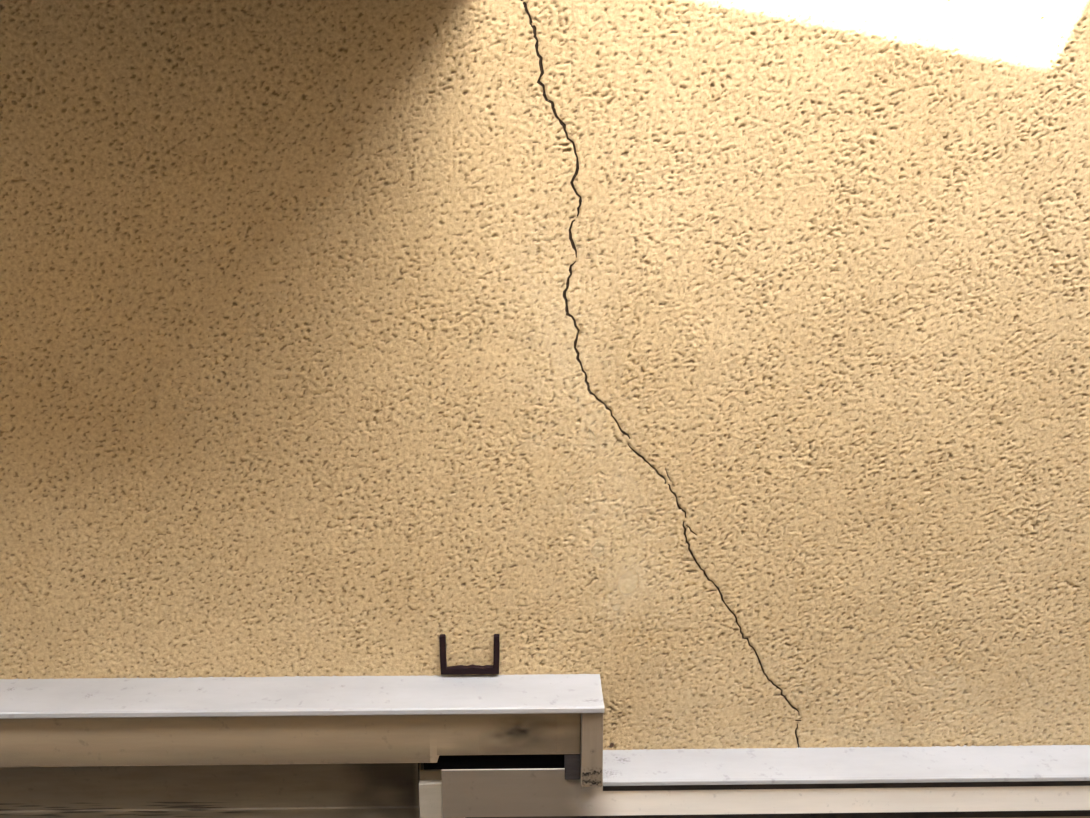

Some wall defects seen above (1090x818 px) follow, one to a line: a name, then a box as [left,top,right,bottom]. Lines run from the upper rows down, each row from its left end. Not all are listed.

crack [521,0,801,748]